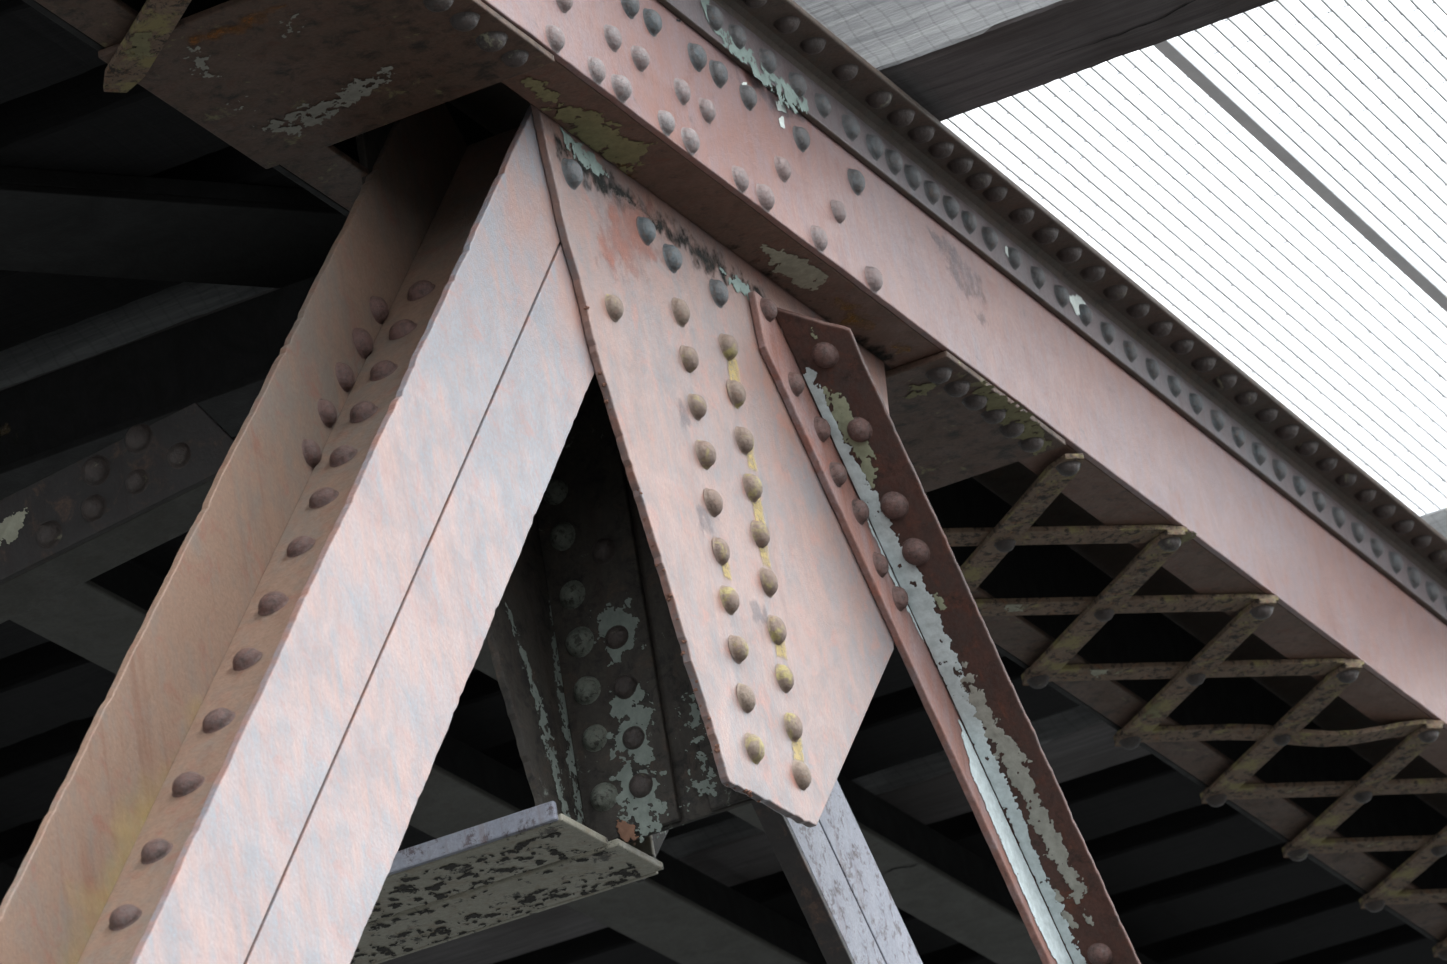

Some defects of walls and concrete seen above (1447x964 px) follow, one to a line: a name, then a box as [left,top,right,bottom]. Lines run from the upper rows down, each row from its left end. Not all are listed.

peeling [183,46,228,78]
crack [1031,0,1195,64]
peeling [226,66,395,137]
peeling [521,75,658,174]
peeling [760,244,829,291]
peeling [0,507,27,546]
peeling [803,367,1094,964]
peeling [350,833,641,964]